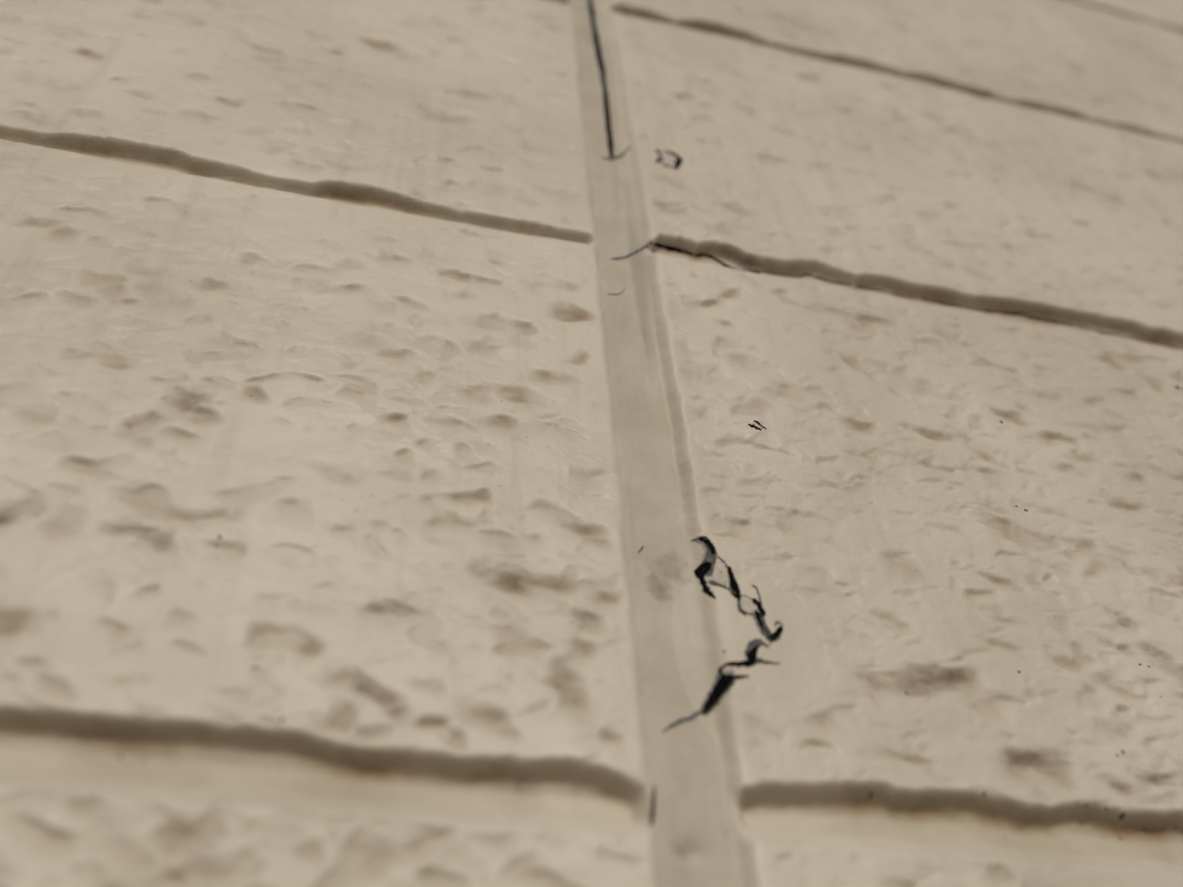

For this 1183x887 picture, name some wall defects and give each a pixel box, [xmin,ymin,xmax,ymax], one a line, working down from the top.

crack [603,146,631,160]
crack [610,242,1183,349]
crack [662,536,783,733]